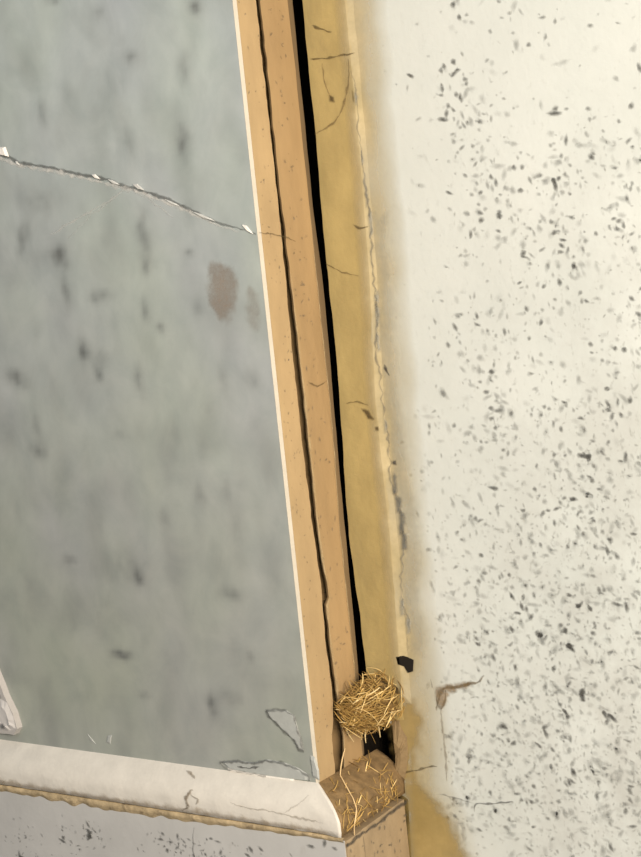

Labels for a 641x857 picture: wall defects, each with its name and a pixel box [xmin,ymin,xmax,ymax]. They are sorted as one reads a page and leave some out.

crack [0,147,253,234]
peeling [222,709,320,781]